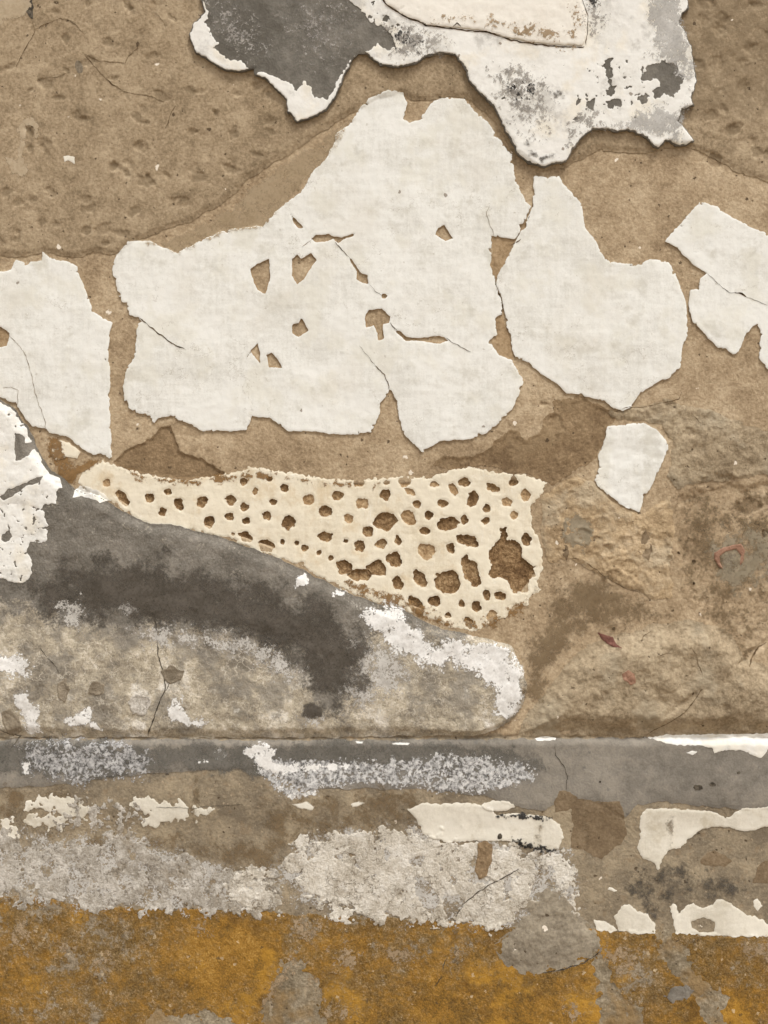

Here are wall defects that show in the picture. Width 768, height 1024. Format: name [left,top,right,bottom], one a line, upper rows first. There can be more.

peeling [190,1,351,121]
peeling [350,0,696,166]
flaking render [365,294,448,344]
flaking render [491,315,514,360]
flaking render [490,223,526,279]
peeling [0,402,111,583]
flaking render [431,395,768,600]
crack [148,617,170,734]
damp [18,547,671,729]
damp [0,652,551,934]
peeling [0,790,768,1024]
damp [476,835,579,929]